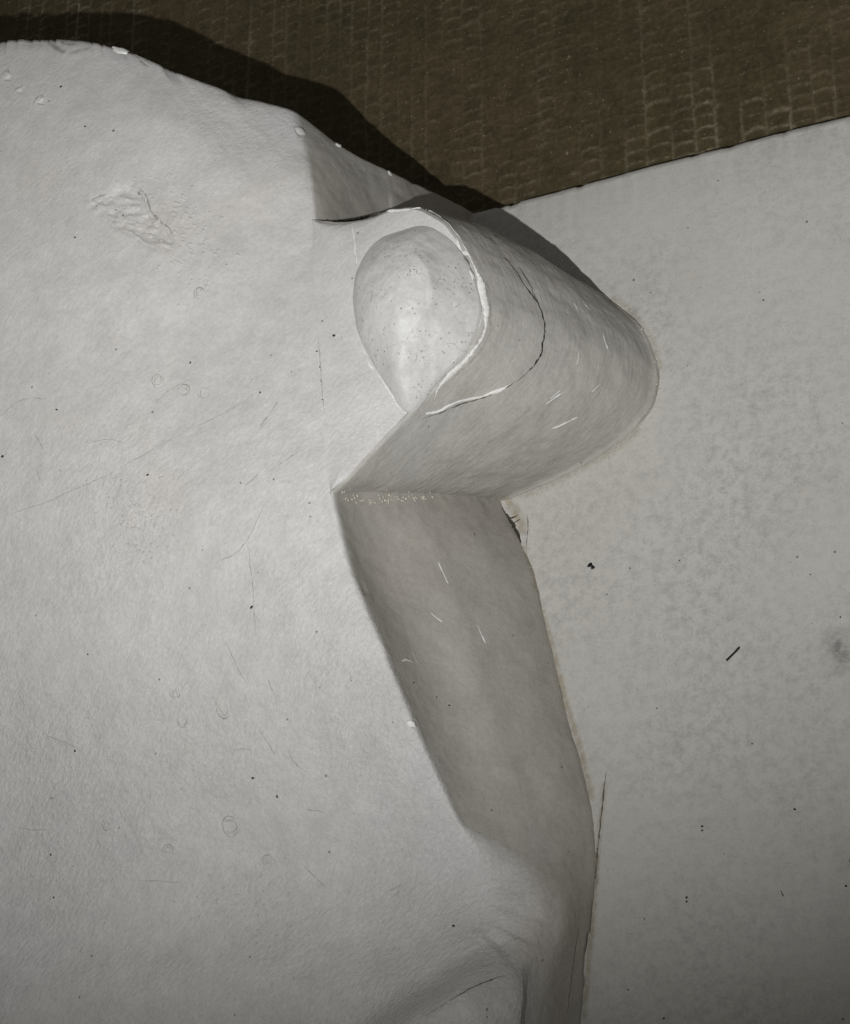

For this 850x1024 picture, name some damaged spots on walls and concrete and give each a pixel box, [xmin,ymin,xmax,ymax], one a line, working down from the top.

peeling [315,207,492,400]